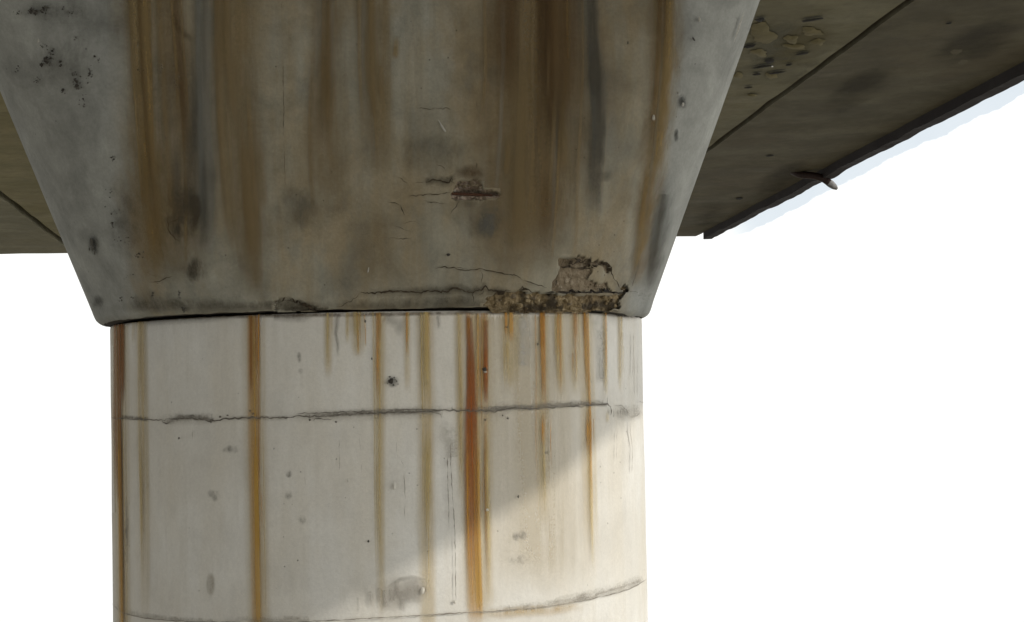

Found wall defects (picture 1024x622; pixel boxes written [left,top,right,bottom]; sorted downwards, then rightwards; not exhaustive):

peeling [733,17,825,97]
spalling [451,164,501,212]
crack [340,266,546,307]
spalling [483,256,628,314]
rust [541,313,561,359]
rust [114,324,124,622]
rust [250,315,260,622]
crack [112,400,643,473]
rust [466,315,489,609]